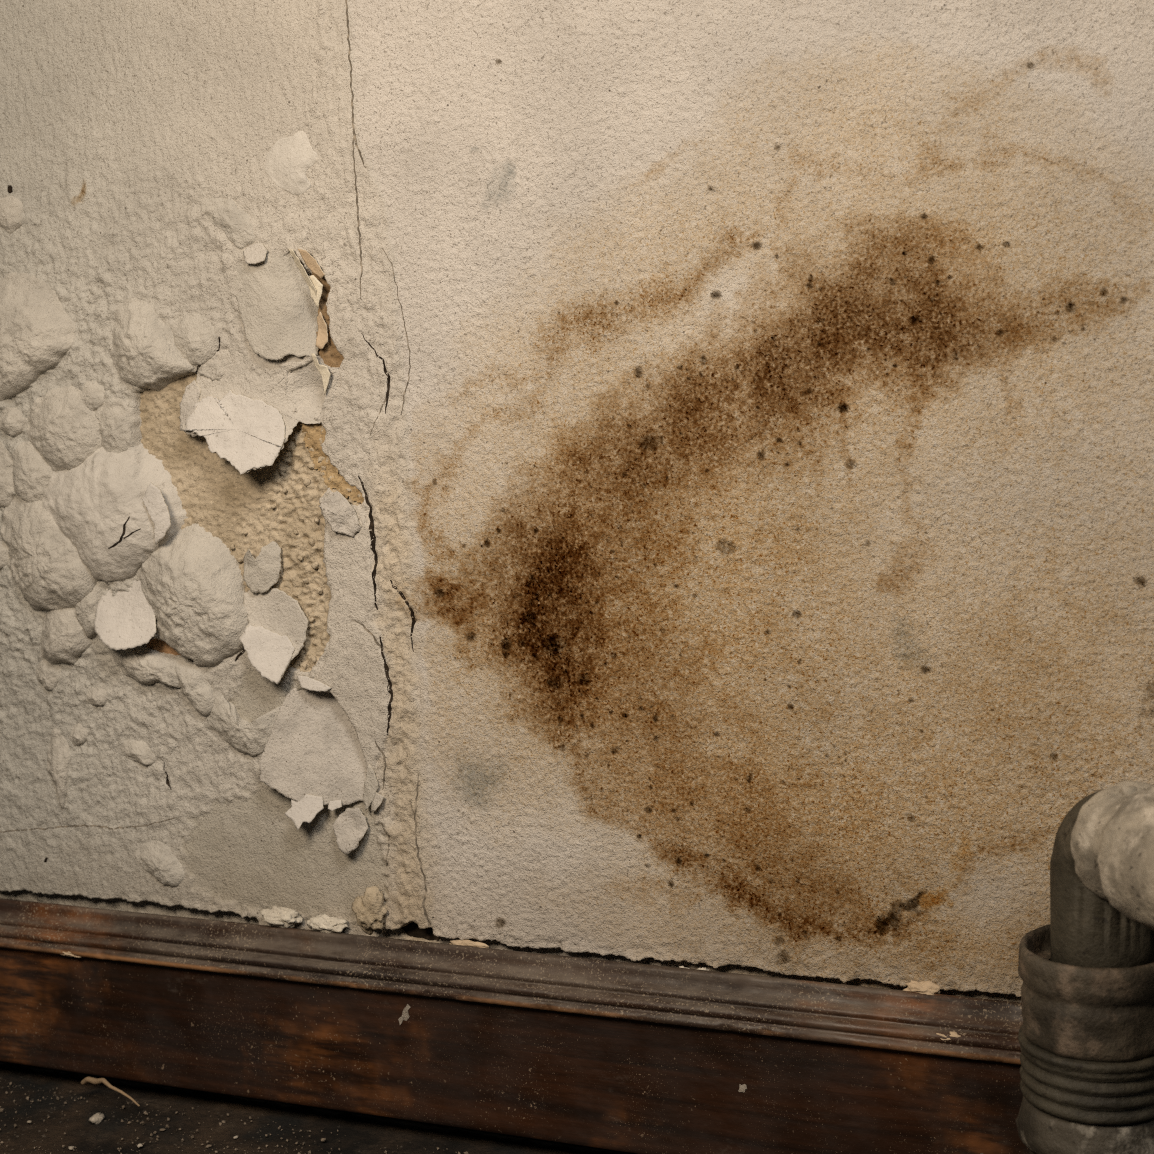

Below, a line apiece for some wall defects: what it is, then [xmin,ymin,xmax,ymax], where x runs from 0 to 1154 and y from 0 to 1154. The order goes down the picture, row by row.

crack [345,0,411,438]
flaking render [139,243,384,854]
crack [353,475,420,790]
crack [381,773,431,926]
leakage [416,214,1102,973]